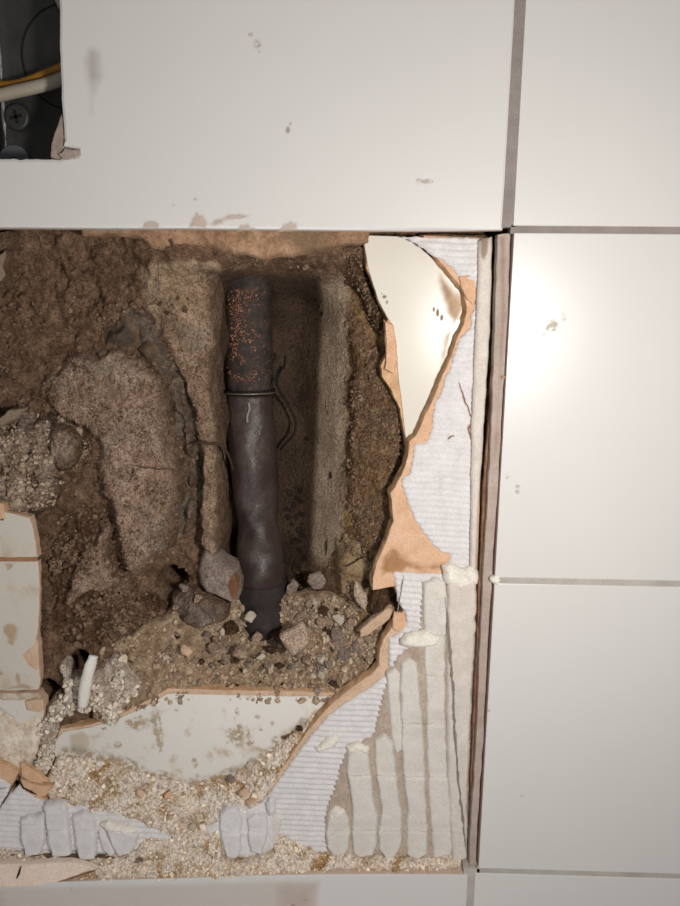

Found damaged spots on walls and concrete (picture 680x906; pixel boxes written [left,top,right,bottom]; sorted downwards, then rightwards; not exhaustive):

spalling [0,230,21,287]
rust [226,289,269,382]
peeling [458,275,476,305]
spalling [328,246,405,609]
spalling [0,273,244,775]
peeling [359,604,407,637]